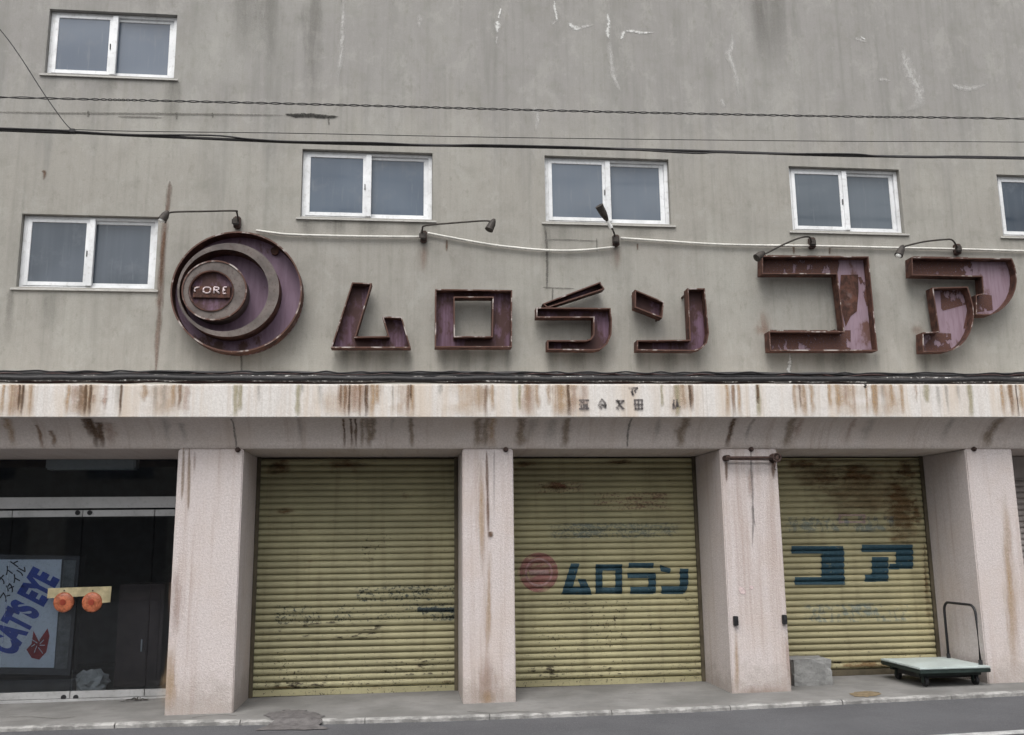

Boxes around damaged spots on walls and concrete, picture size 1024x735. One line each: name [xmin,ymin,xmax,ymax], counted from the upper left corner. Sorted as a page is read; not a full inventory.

corrosion [155,182,171,370]
corrosion [1,385,31,409]
corrosion [66,385,104,441]
corrosion [340,385,378,440]
corrosion [519,385,570,440]
corrosion [1000,385,1023,410]
corrosion [480,453,493,537]